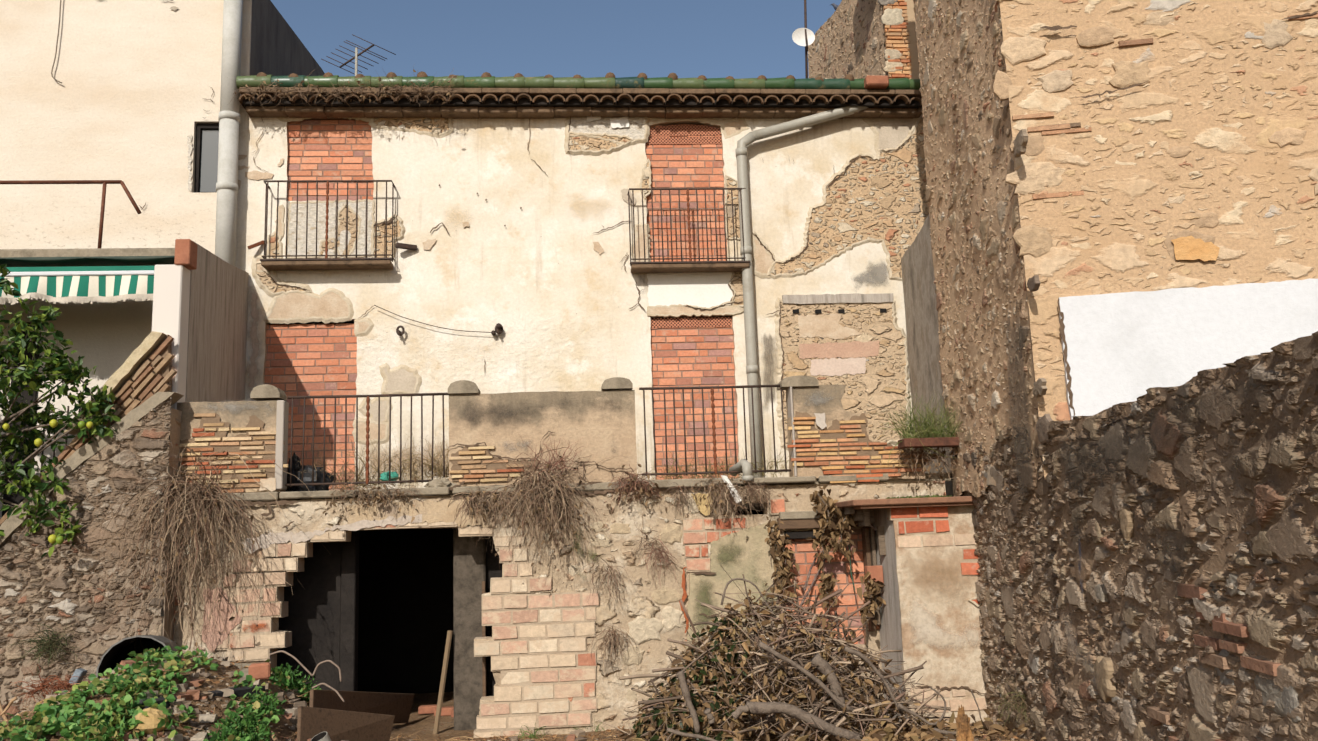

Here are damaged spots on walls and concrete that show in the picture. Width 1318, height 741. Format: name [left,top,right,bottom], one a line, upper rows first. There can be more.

flaking render [251,199,406,337]
crack [527,117,571,174]
flaking render [564,116,652,205]
flaking render [629,114,929,318]
flaking render [774,298,935,484]
flaking render [449,444,540,483]